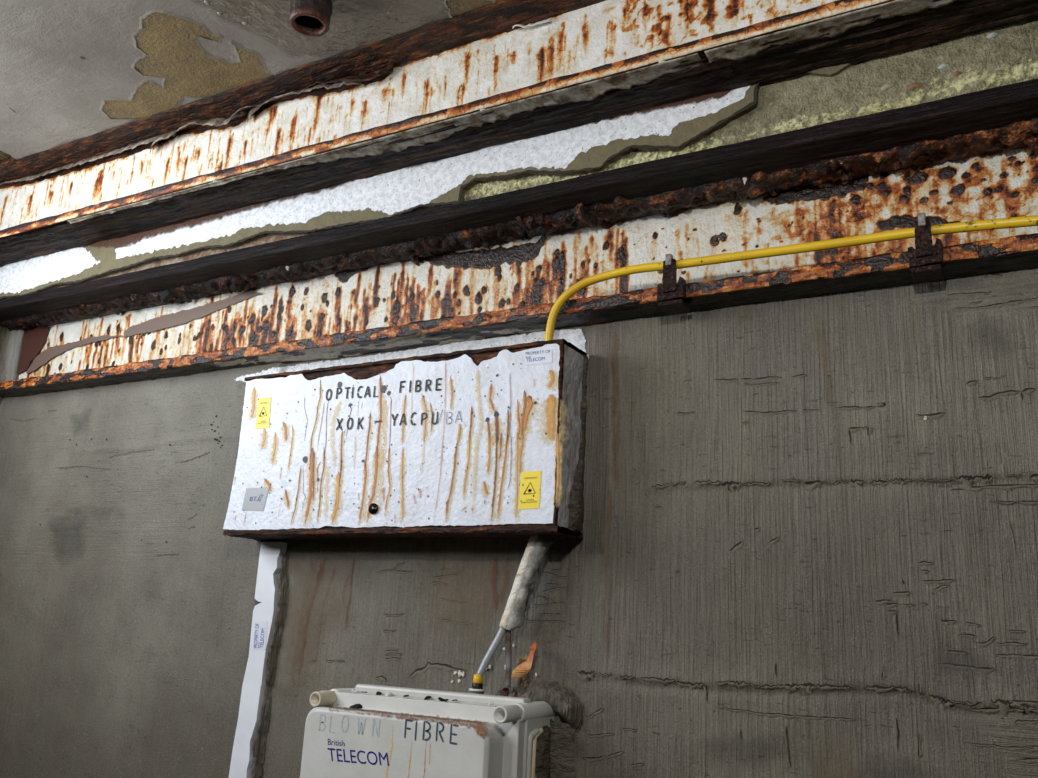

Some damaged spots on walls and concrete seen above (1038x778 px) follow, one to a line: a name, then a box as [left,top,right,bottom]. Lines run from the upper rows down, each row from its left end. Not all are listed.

peeling [99,9,282,120]
water stain [195,0,448,56]
peeling [444,0,501,18]
peeling [115,86,750,259]
corrosion [0,0,1038,267]
peeling [0,246,100,294]
crack [875,561,1038,674]
crack [704,685,866,767]
crack [894,718,924,758]